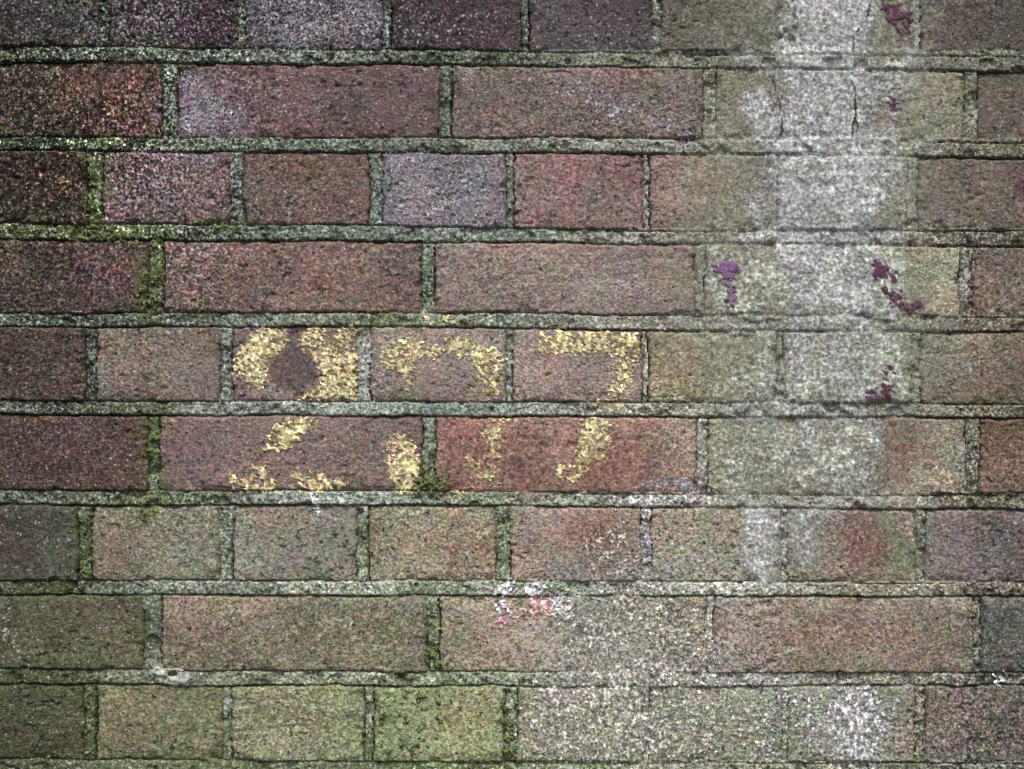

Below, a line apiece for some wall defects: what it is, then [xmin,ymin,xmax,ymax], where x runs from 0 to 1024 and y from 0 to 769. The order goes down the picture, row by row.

leakage [563,0,947,586]
crack [851,3,871,136]